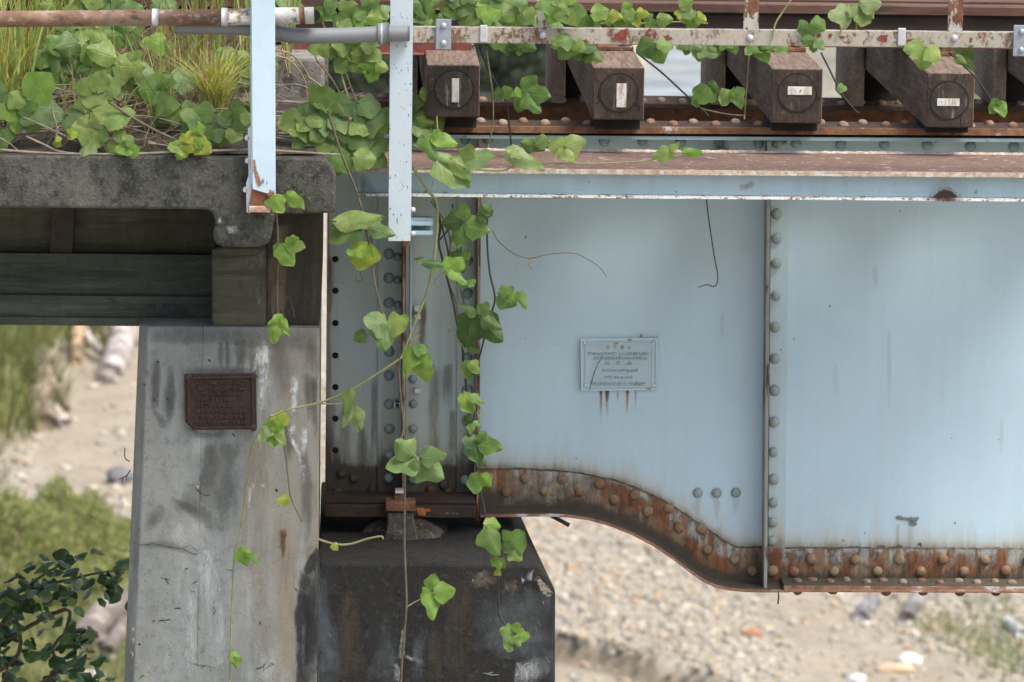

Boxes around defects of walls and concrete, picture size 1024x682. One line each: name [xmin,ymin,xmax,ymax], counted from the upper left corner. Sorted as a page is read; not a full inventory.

rust [253,160,275,196]
rust [930,188,959,202]
damp [254,345,269,404]
damp [288,426,307,480]
rust [877,542,940,575]